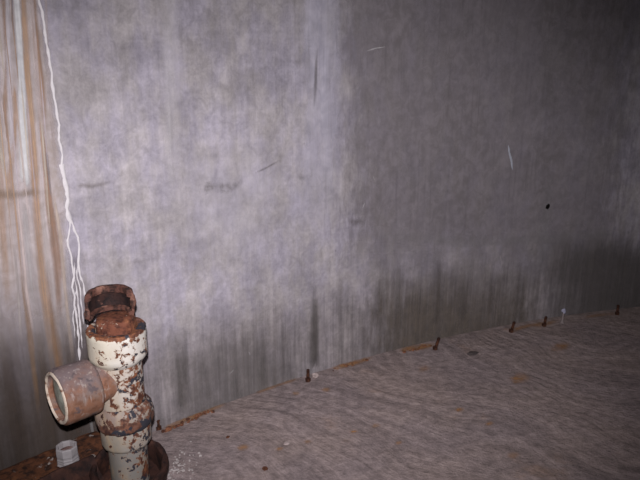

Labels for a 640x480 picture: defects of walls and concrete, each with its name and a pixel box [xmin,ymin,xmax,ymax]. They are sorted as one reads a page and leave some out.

corrosion [0,0,67,310]
crack [38,0,89,360]
damp [379,293,524,352]